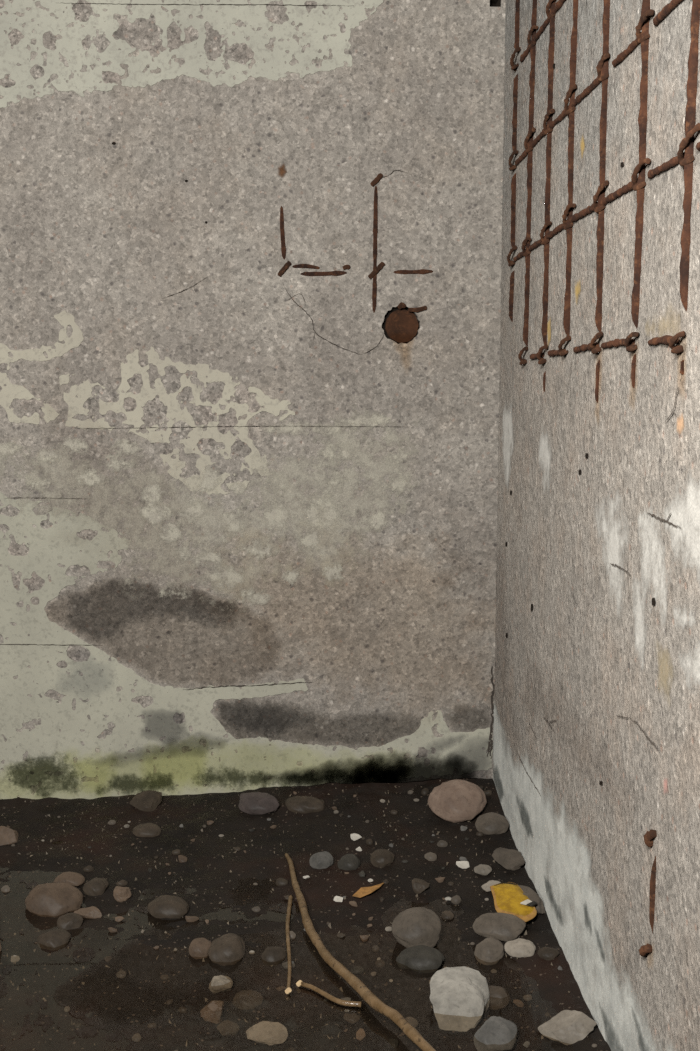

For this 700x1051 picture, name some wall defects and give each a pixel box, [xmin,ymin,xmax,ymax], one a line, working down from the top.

peeling [0,0,388,108]
corrosion [278,206,351,277]
corrosion [368,173,433,313]
peeling [0,310,493,799]
leakage [12,758,76,796]
leakage [112,776,171,791]
leakage [203,770,270,783]
leakage [283,757,474,784]
leakage [493,705,672,1051]